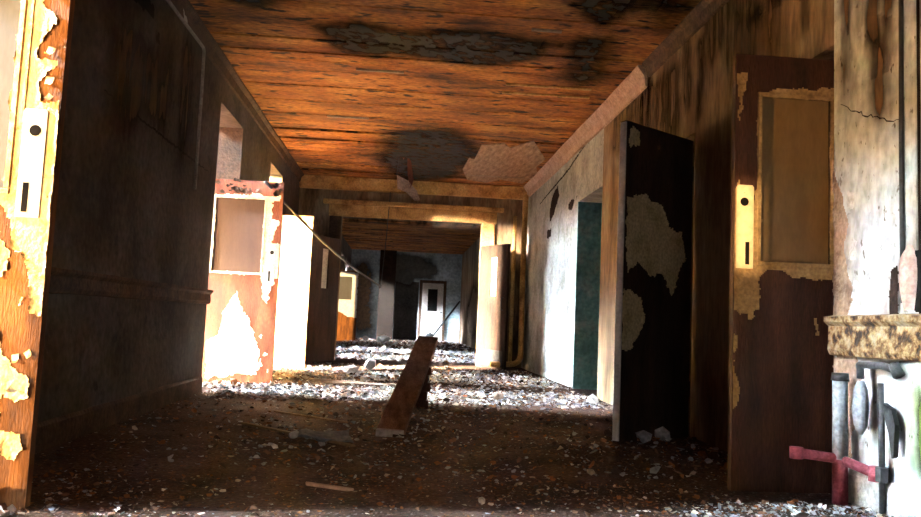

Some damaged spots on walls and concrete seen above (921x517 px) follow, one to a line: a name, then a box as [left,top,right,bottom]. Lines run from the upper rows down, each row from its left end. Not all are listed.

crack [841,104,899,122]
peeling [0,0,65,316]
peeling [209,192,312,352]
peeling [625,194,687,296]
peeling [622,289,646,351]
peeling [0,348,31,403]
peeling [0,431,22,461]